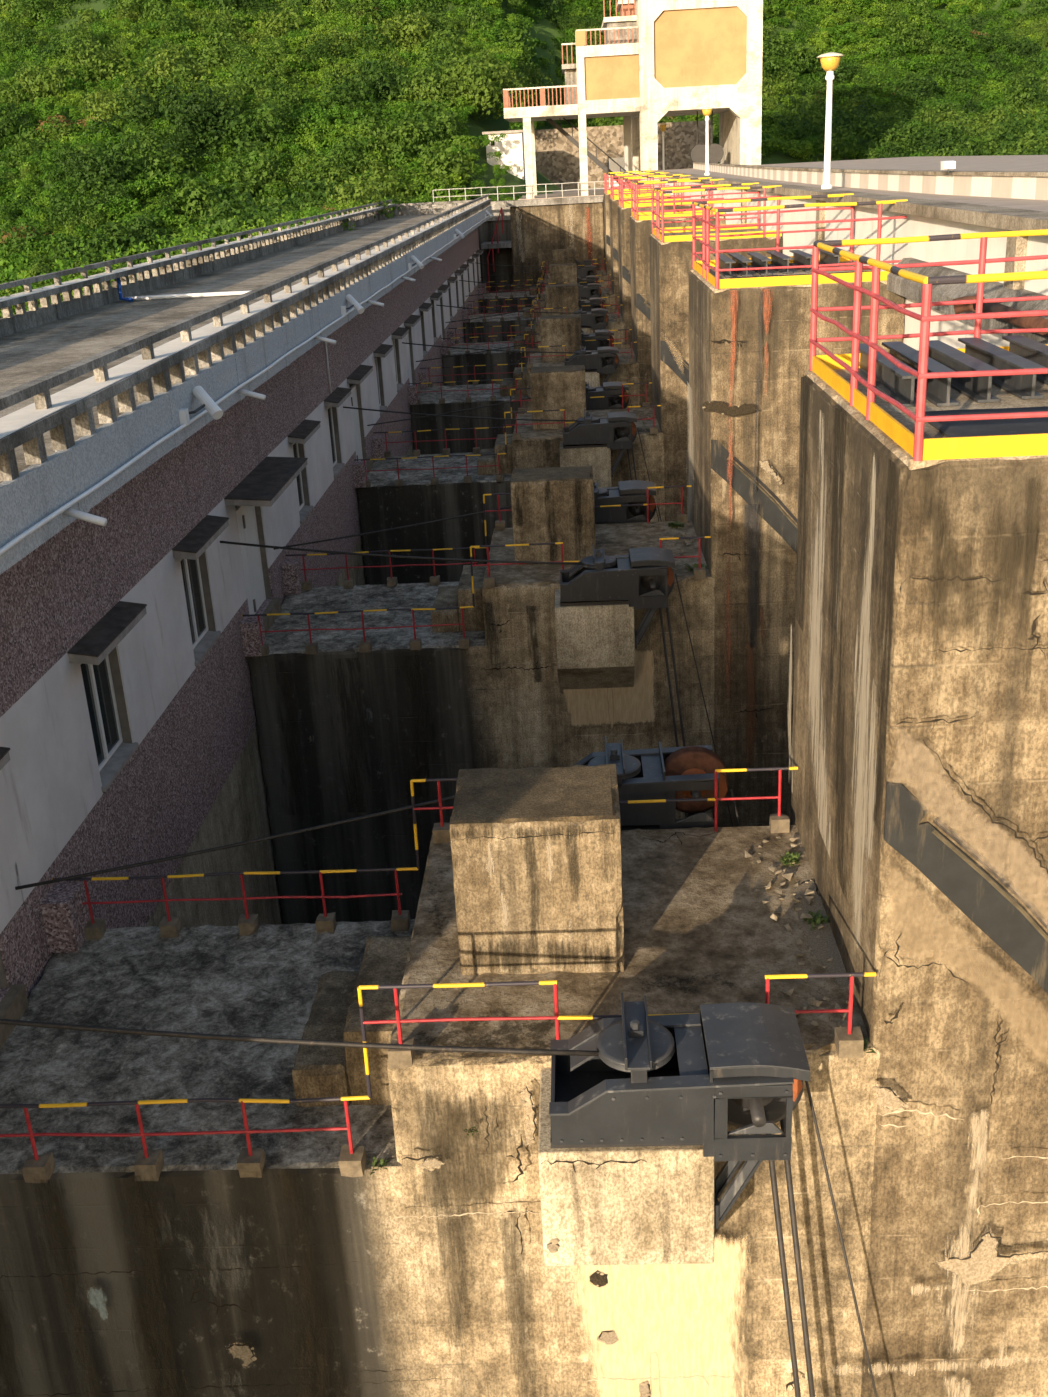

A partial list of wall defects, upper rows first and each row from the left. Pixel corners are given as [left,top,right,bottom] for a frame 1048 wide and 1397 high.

water stain [916,469,1040,690]
water stain [788,374,911,948]
crack [896,716,1048,874]
crack [884,933,967,983]
crack [884,1010,900,1024]
crack [878,1021,1007,1128]
water stain [39,1179,107,1397]
spalling [589,1270,608,1287]
spalling [933,1231,1048,1285]
spalling [227,1342,257,1368]
spalling [597,1330,618,1344]
spalling [639,1380,651,1397]